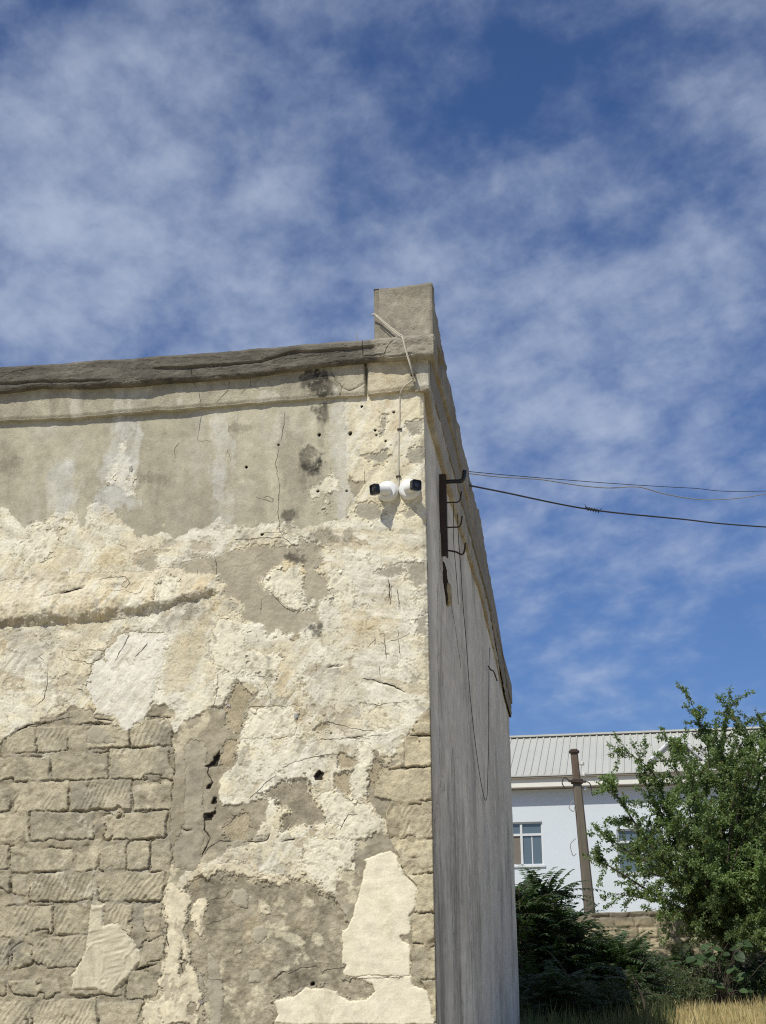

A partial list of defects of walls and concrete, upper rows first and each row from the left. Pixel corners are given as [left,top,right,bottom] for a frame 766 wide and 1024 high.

crack [235,414,298,552]
leakage [272,367,358,578]
flaking render [0,536,437,1024]
crack [183,678,404,855]